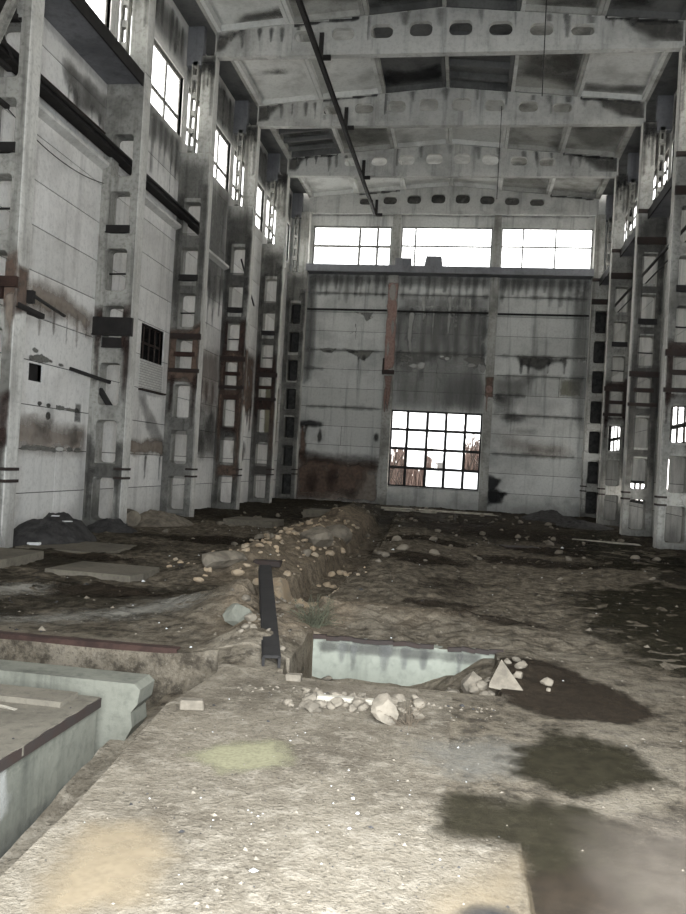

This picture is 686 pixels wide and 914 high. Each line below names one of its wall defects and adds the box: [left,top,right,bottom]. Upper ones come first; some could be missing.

water stain [144,0,359,219]
water stain [305,94,387,113]
water stain [384,65,441,84]
water stain [207,186,252,368]
water stain [198,255,386,502]
corrosion [383,376,392,412]
water stain [397,296,485,407]
water stain [518,356,566,373]
water stain [19,405,163,519]
water stain [487,476,507,506]